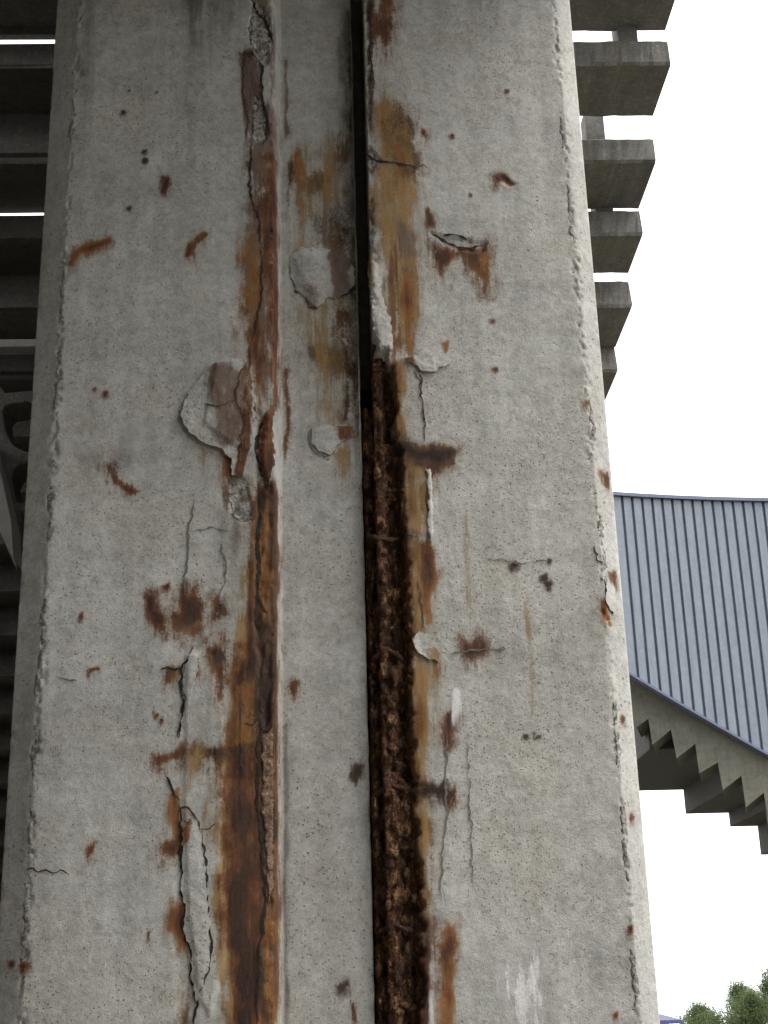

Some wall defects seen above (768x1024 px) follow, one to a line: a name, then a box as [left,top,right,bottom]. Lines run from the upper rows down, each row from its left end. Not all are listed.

corrosion [68,236,115,267]
spalling [251,96,266,145]
spalling [248,9,272,66]
corrosion [237,0,359,458]
crack [432,233,485,250]
crack [183,498,230,599]
corrosion [143,479,300,1024]
peeling [181,358,276,522]
crack [204,0,273,1024]
spalling [311,253,440,1024]
corrosion [369,92,497,1024]
crack [165,776,216,1024]